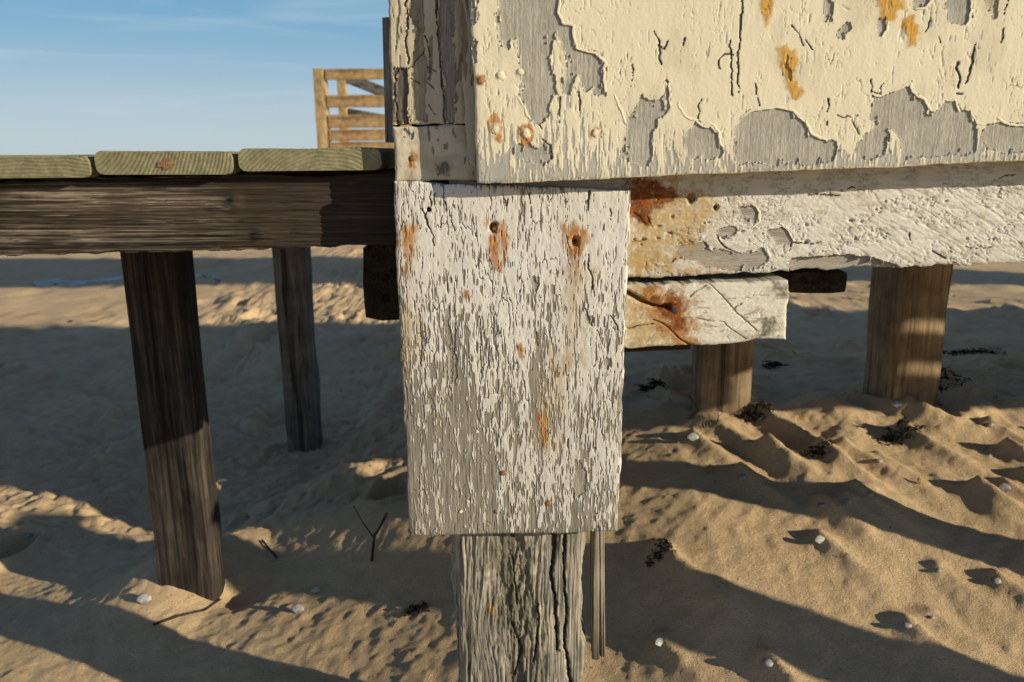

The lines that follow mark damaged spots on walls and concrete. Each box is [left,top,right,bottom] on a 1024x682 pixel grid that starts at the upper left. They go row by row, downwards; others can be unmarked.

peeling [469,0,479,64]
peeling [494,0,839,167]
rust [518,124,533,146]
peeling [854,81,1024,161]
rust [626,177,678,226]
rust [398,225,416,270]
rust [489,223,507,272]
rust [562,224,588,269]
rust [640,286,697,345]
peeling [573,462,587,498]
crack [509,533,572,682]